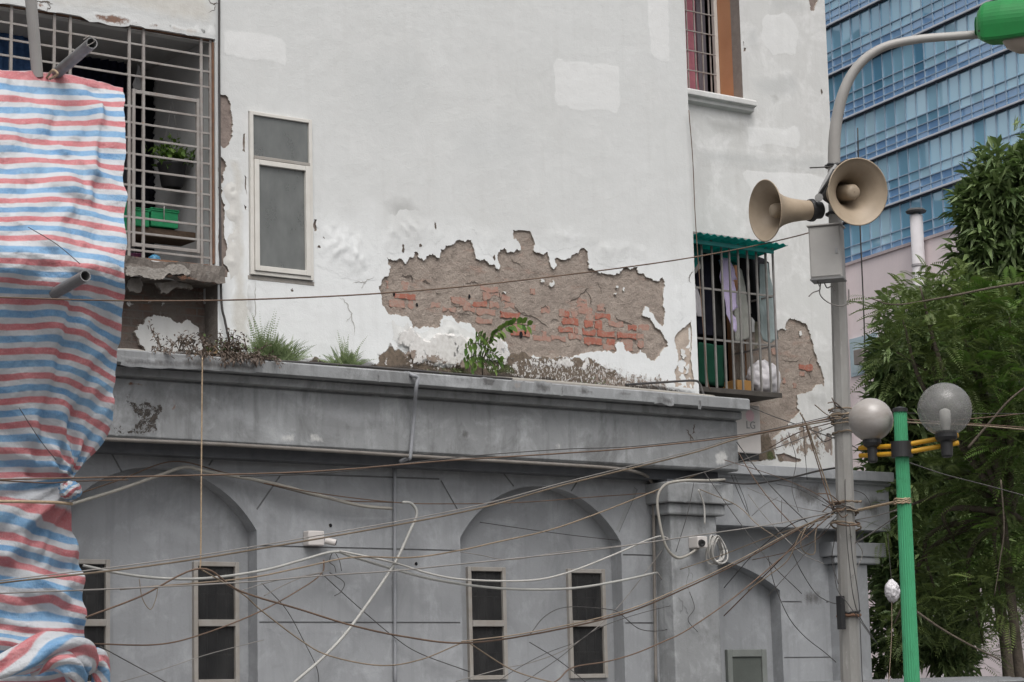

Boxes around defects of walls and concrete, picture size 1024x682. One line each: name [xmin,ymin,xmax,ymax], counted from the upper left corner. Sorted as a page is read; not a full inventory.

peeling [218,95,244,277]
spalling [124,264,193,295]
peeling [132,315,203,354]
leakage [109,387,264,436]
peeling [379,230,693,388]
peeling [733,319,831,462]